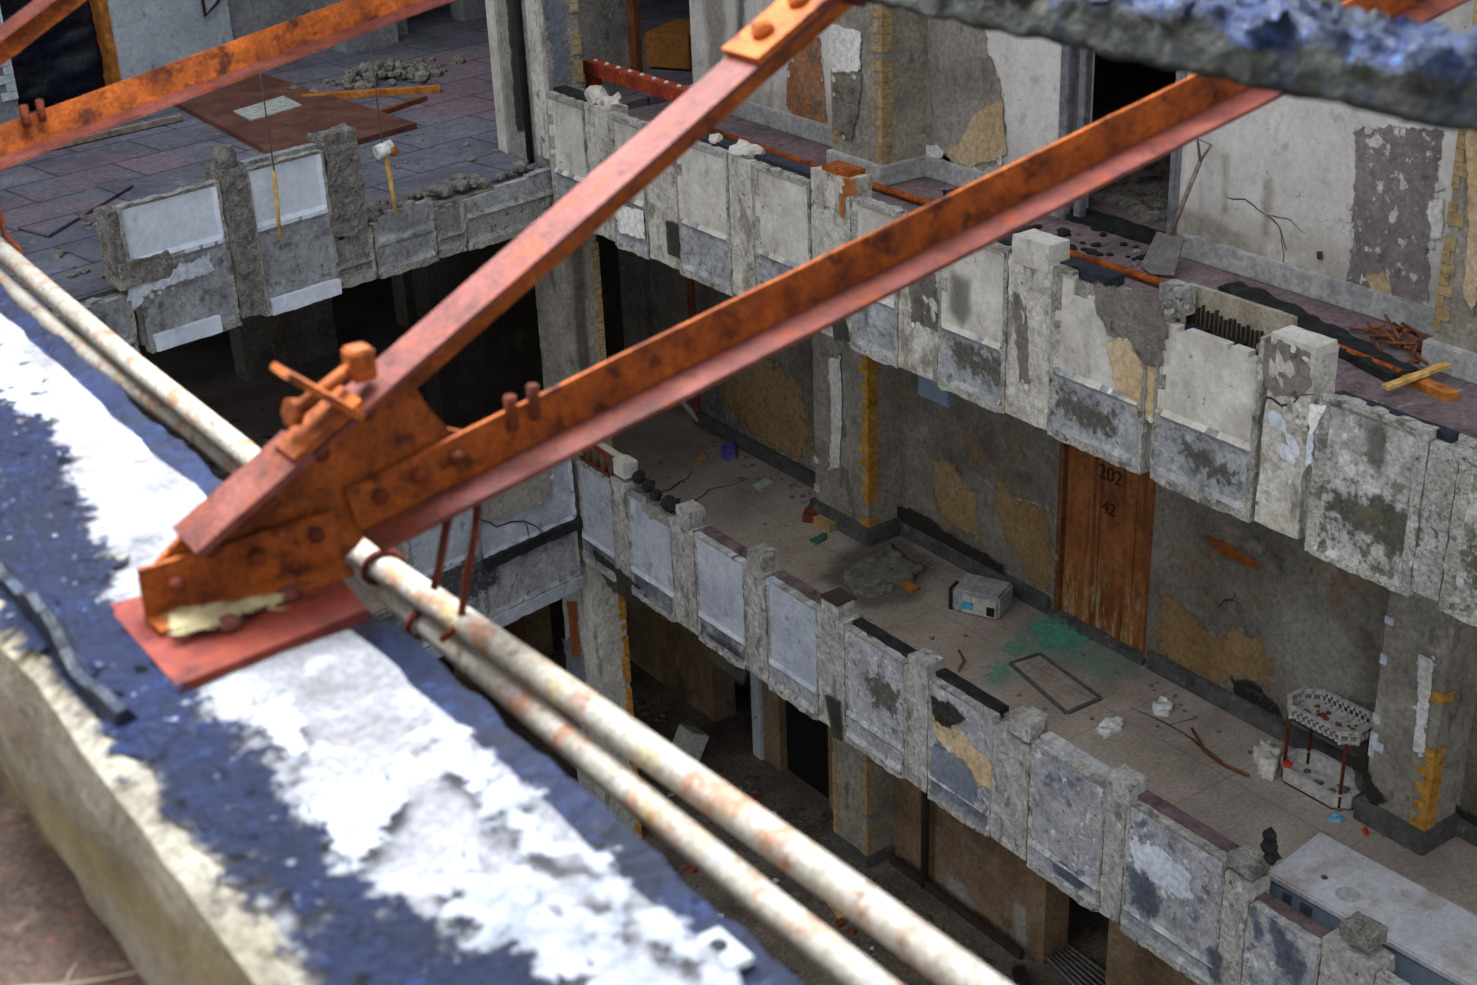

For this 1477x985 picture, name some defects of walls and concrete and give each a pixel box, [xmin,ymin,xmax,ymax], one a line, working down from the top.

peeling [786,24,862,140]
rust [834,175,858,217]
peeling [1346,121,1445,306]
peeling [1462,131,1477,315]
spalling [1093,281,1167,423]
leakage [1055,386,1119,444]
leakage [1171,429,1240,486]
rust [567,601,580,658]
peeling [1157,594,1274,692]
peeling [241,695,313,766]
peeling [930,713,992,813]
peeling [296,711,748,985]